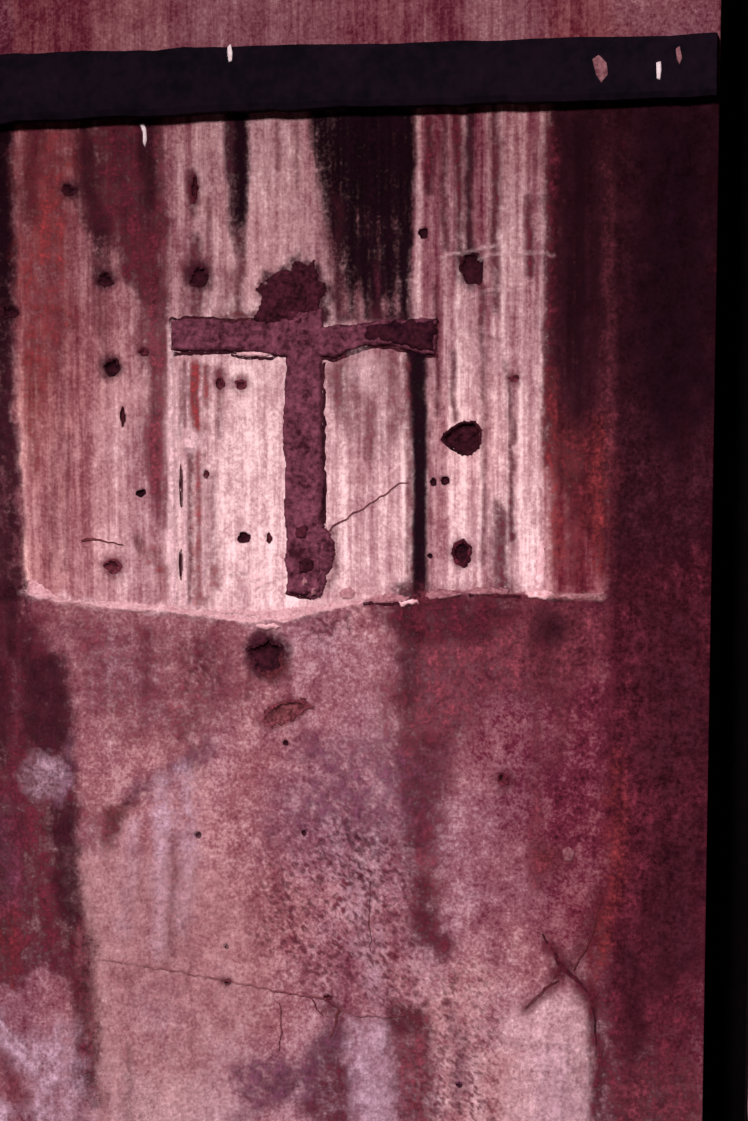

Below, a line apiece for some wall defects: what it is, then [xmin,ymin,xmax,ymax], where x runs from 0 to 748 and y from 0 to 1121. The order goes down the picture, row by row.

damp [224,108,474,322]
corrosion [180,362,220,431]
corrosion [330,359,355,421]
corrosion [188,452,213,606]
crack [328,482,408,532]
damp [0,125,105,1107]
crack [366,881,374,951]
crack [96,958,419,1051]
crack [525,904,600,1062]